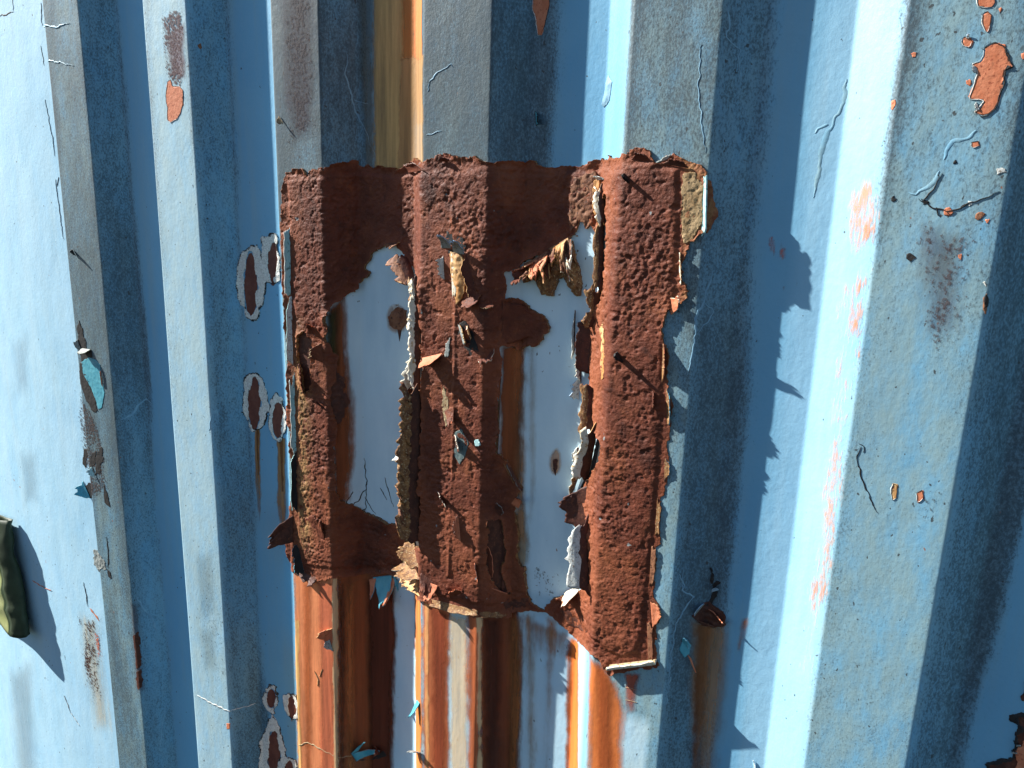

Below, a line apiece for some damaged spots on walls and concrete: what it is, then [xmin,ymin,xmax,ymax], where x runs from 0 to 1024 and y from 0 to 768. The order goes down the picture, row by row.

peeling [961,0,1024,118]
crack [919,173,996,216]
peeling [73,321,110,507]
corrosion [327,302,353,501]
corrosion [388,304,408,341]
peeling [267,147,718,677]
corrosion [500,346,559,593]
crack [856,443,877,512]
corrosion [267,573,395,768]
corrosion [415,594,450,768]
corrosion [466,612,557,768]
corrosion [565,639,638,768]